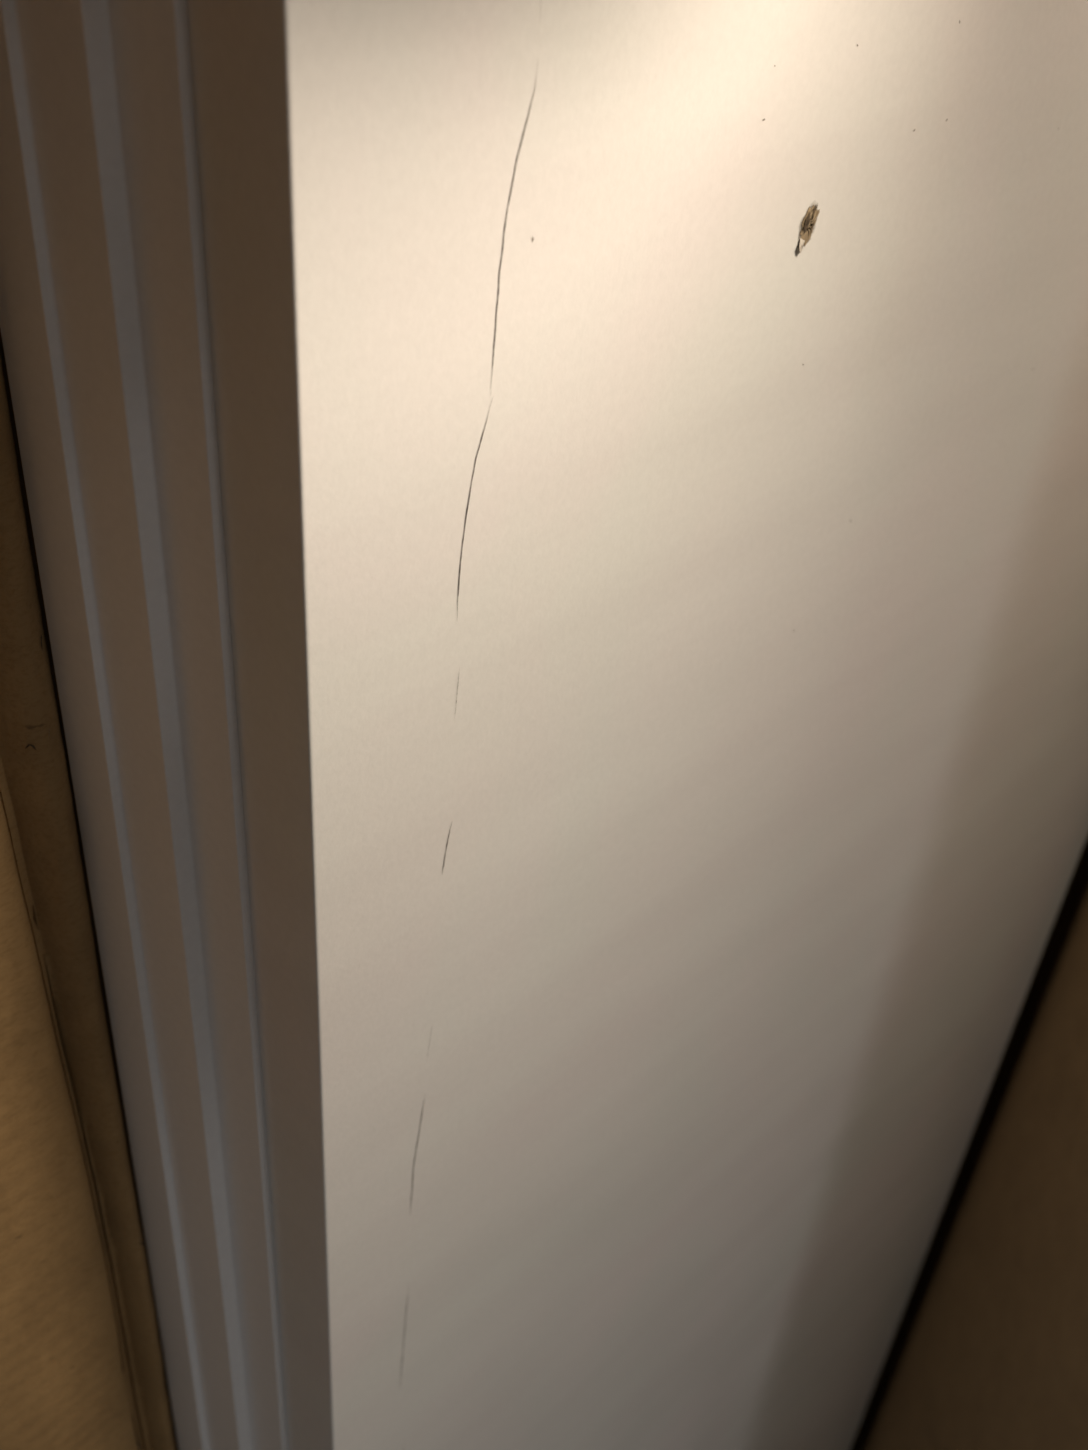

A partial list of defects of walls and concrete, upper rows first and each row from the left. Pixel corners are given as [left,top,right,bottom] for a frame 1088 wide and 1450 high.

crack [457,75,537,617]
crack [410,1104,424,1211]